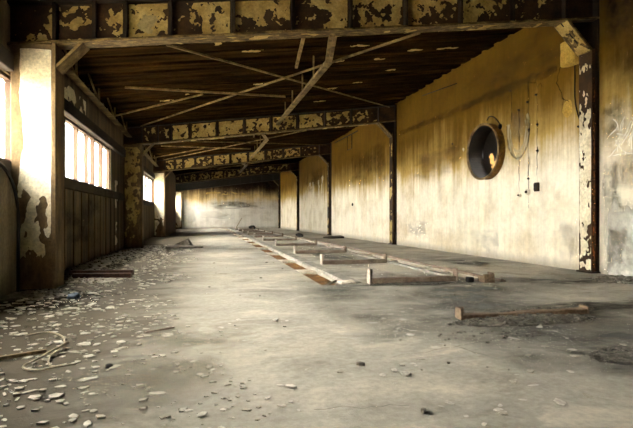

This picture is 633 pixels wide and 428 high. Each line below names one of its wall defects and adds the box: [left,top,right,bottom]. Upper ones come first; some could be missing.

peeling [99,3,175,37]
peeling [178,0,507,45]
peeling [555,21,590,56]
peeling [17,6,92,259]
peeling [144,110,377,142]
peeling [115,147,140,238]
peeling [154,147,316,235]
peeling [579,91,591,270]